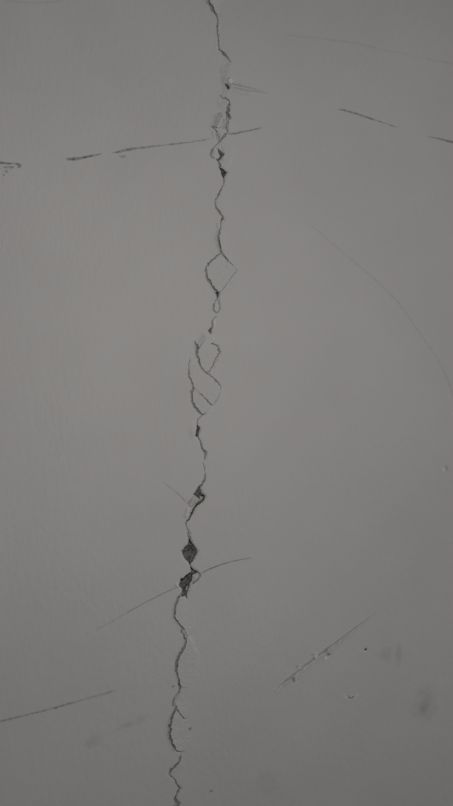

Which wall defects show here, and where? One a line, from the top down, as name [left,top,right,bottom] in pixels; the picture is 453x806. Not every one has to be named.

crack [168,0,242,806]